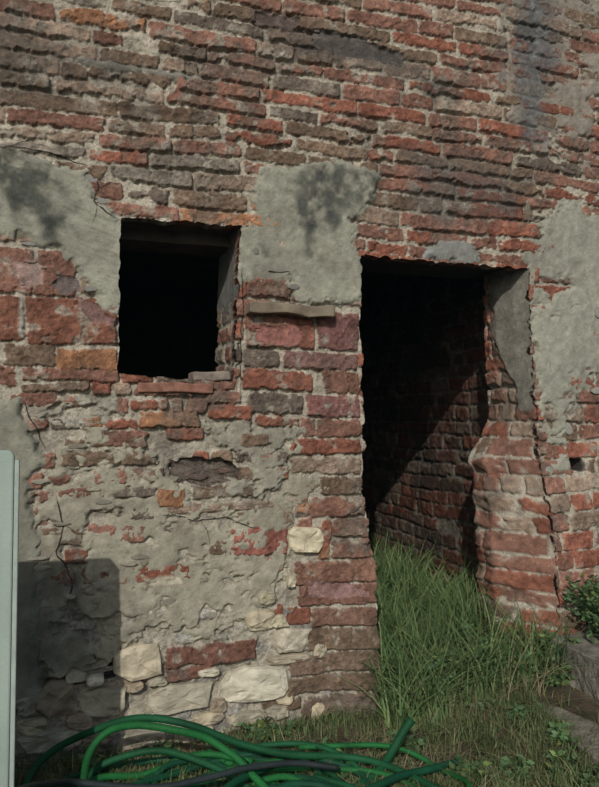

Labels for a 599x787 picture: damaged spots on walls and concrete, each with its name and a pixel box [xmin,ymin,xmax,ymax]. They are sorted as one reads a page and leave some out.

water stain [0,150,62,235]
flaking render [0,146,121,316]
crack [4,140,118,220]
water stain [297,169,361,234]
flaking render [519,196,599,476]
crack [47,501,86,603]
spalling [28,387,329,679]